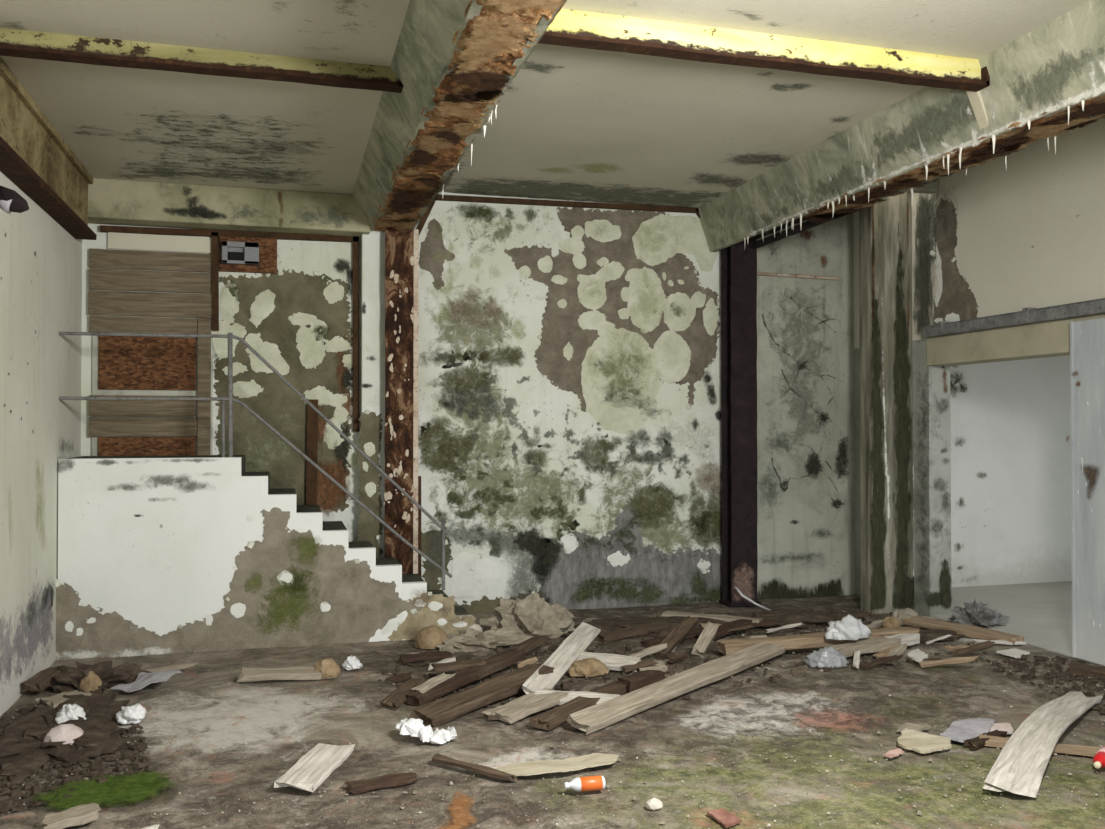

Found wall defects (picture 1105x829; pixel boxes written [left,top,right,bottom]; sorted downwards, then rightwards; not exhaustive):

damp [164,188,266,219]
damp [120,108,332,184]
damp [734,50,1105,236]
damp [913,194,945,333]
peeling [929,198,979,325]
peeling [55,269,722,660]
damp [418,348,522,471]
damp [429,371,722,604]
damp [806,453,822,476]
damp [835,439,848,478]
damp [883,388,894,520]
damp [0,585,171,677]